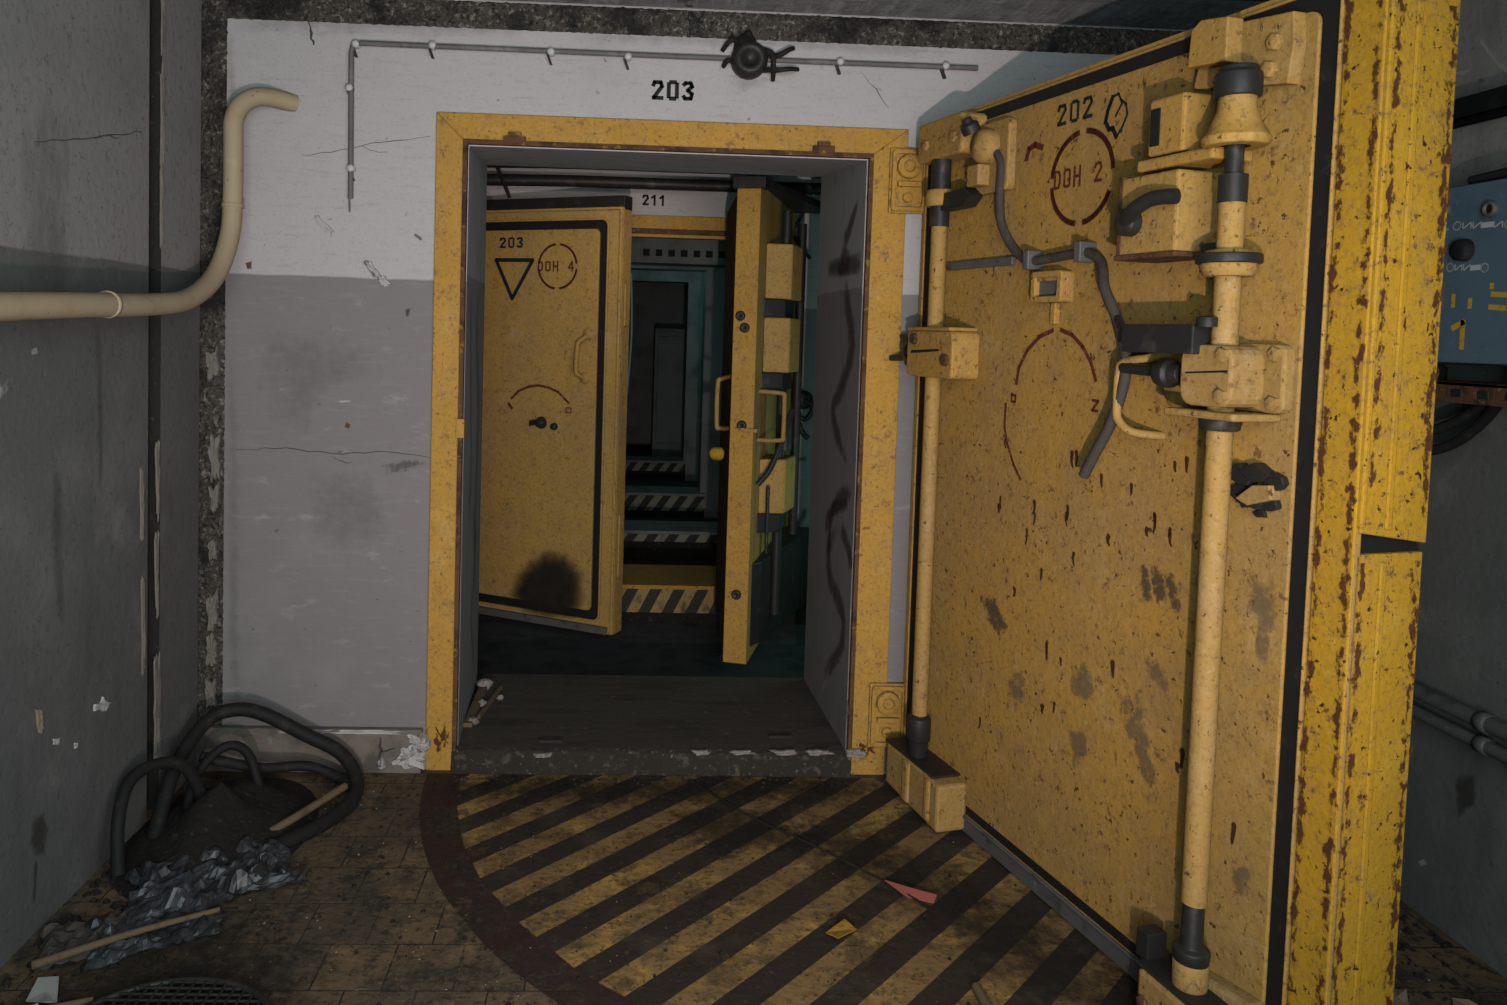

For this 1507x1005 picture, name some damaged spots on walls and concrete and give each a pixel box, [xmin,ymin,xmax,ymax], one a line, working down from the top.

spalling [204,587,218,709]
spalling [205,349,220,380]
spalling [208,539,218,561]
spalling [208,434,221,512]
spalling [314,729,432,770]
rust [1287,650,1315,995]
rust [1310,406,1330,624]
rust [1315,0,1407,1005]
rust [1384,561,1421,1005]
rust [1422,5,1459,516]